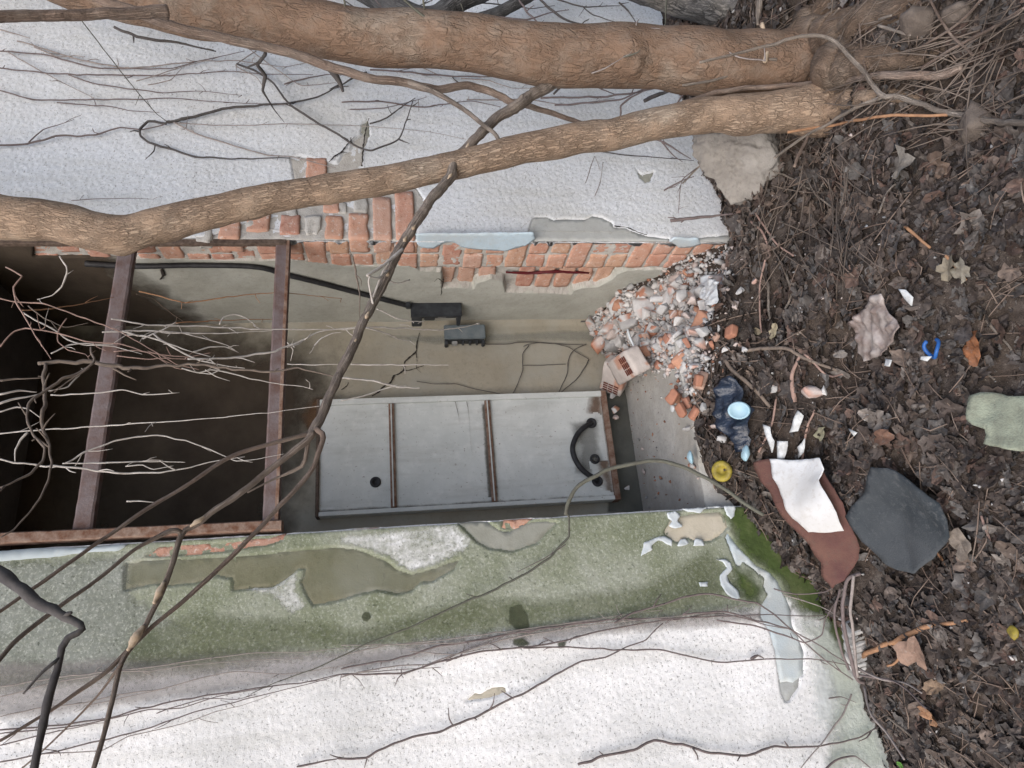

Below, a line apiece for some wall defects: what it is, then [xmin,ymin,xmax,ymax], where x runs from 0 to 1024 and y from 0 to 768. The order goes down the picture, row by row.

flaking render [291,121,370,179]
flaking render [34,246,117,257]
flaking render [137,189,730,287]
crack [372,333,424,396]
flaking render [126,534,459,604]
damp [0,246,889,768]
flaking render [458,518,556,551]
peeling [641,506,804,701]